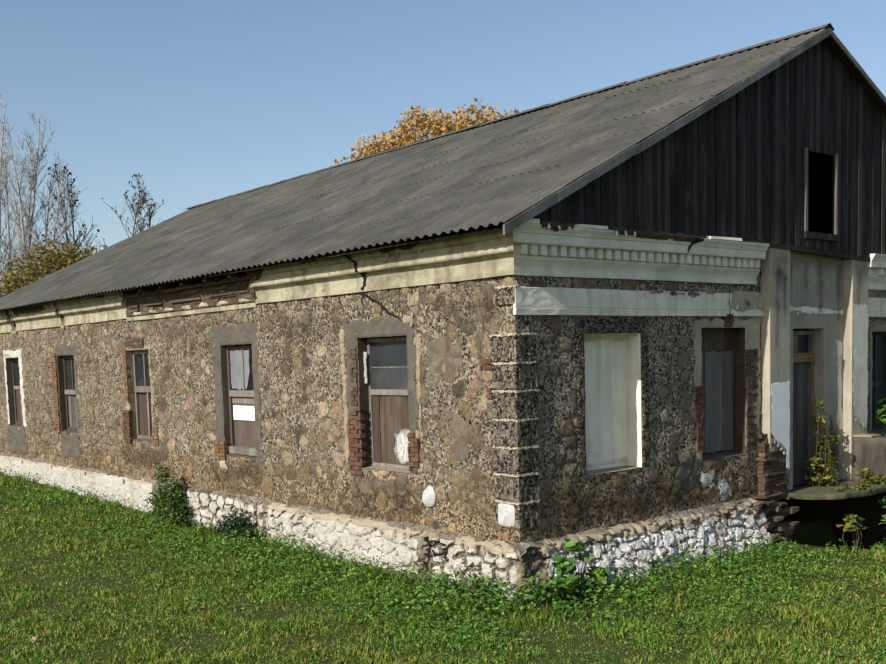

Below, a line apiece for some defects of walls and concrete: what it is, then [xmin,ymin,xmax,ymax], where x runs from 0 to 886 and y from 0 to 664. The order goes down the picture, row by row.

spalling [124,268,265,317]
crack [342,254,402,321]
peeling [790,303,869,430]
peeling [546,349,790,599]